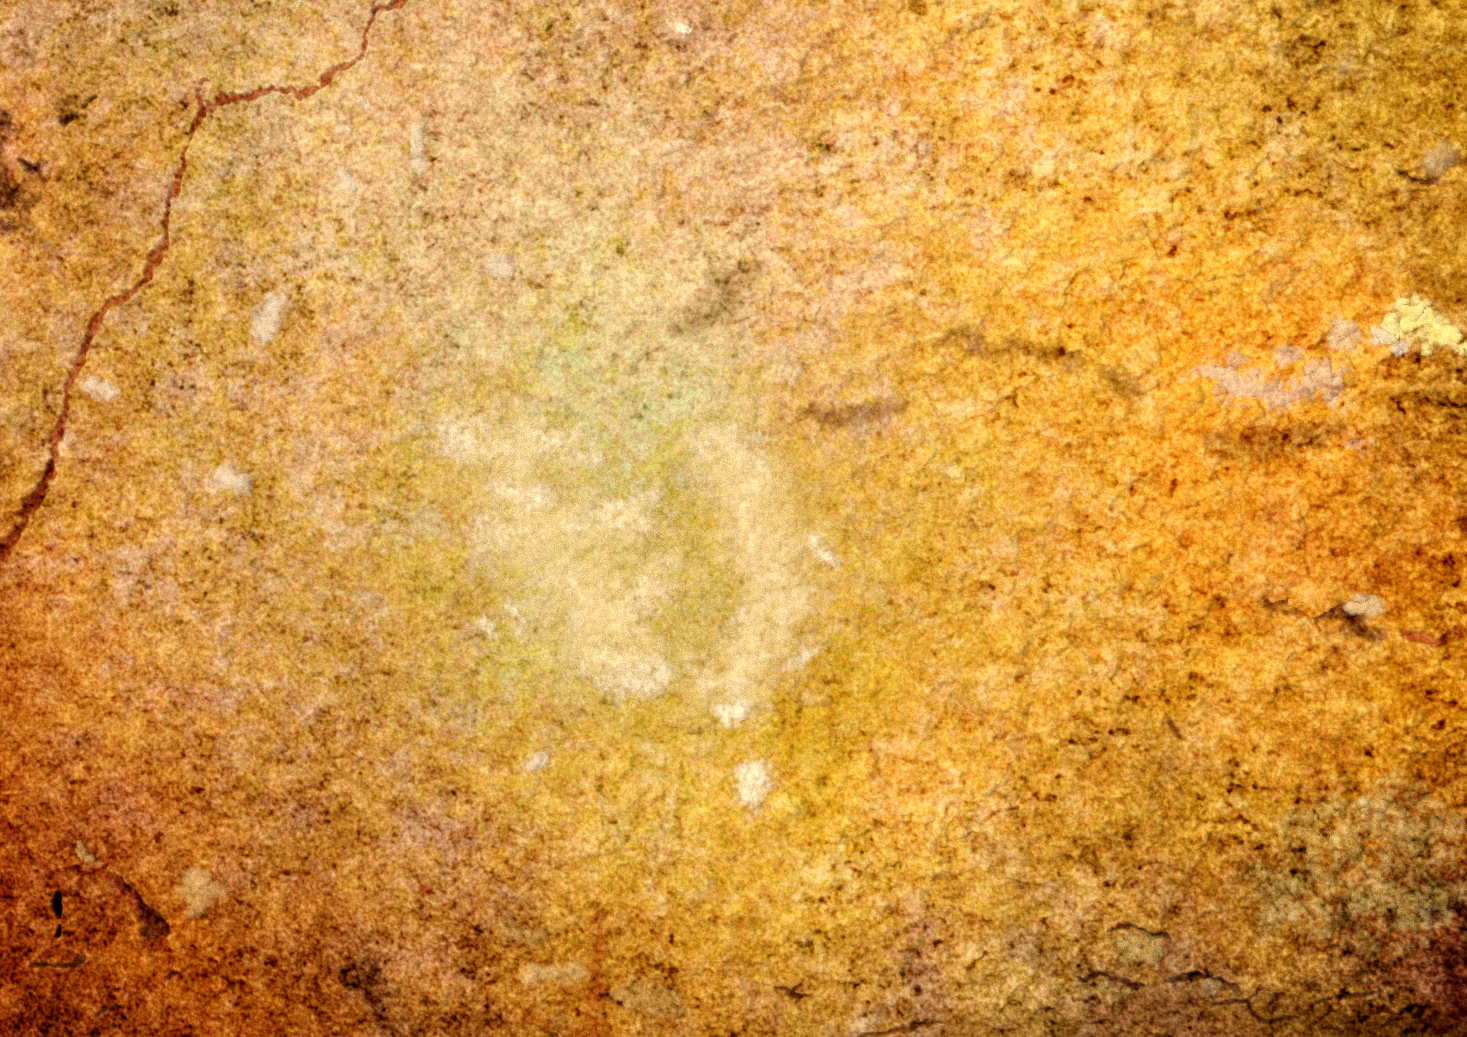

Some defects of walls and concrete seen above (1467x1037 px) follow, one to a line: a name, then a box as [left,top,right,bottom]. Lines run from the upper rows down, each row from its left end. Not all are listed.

crack [0,0,406,559]
crack [0,791,174,987]
crack [94,1005,120,1017]